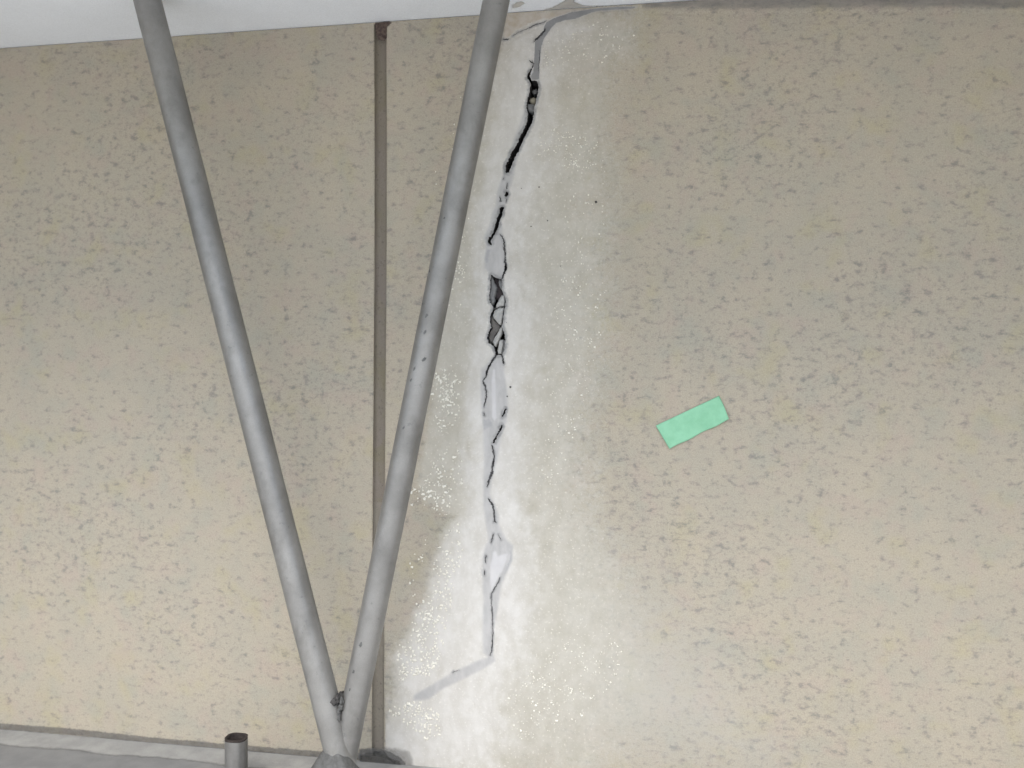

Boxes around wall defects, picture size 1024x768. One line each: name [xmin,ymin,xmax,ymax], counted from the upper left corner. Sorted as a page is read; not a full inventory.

crack [479,5,640,660]